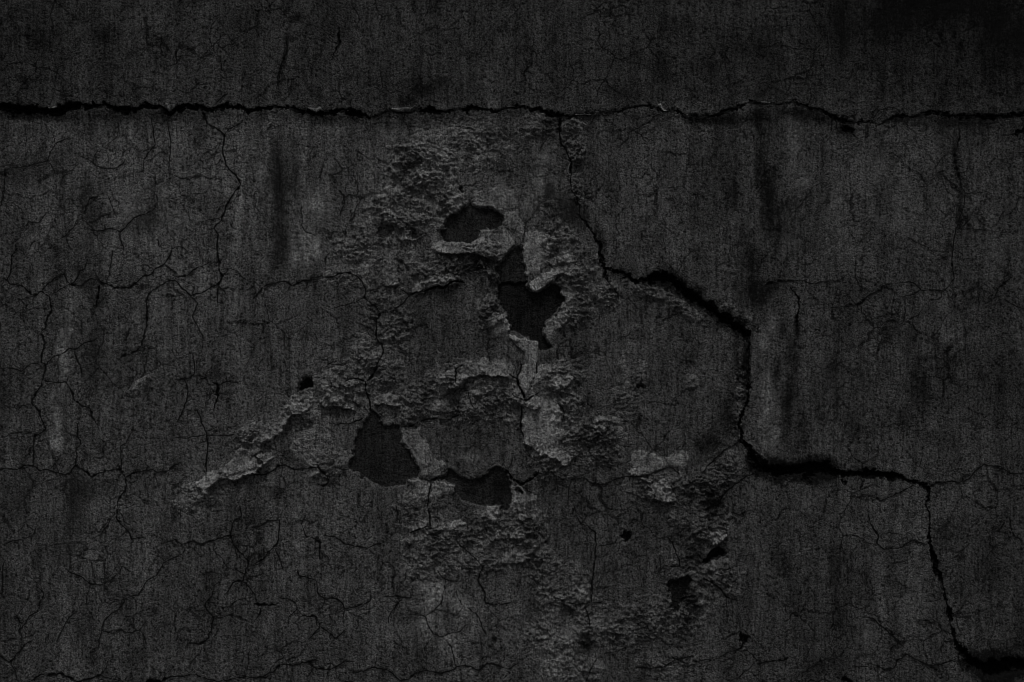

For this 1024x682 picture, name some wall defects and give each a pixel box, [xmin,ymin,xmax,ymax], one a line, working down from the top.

crack [0,476,518,682]
crack [0,93,771,540]
spalling [170,111,761,682]
crack [506,356,742,634]
crack [571,190,1024,682]
crack [776,99,1024,297]